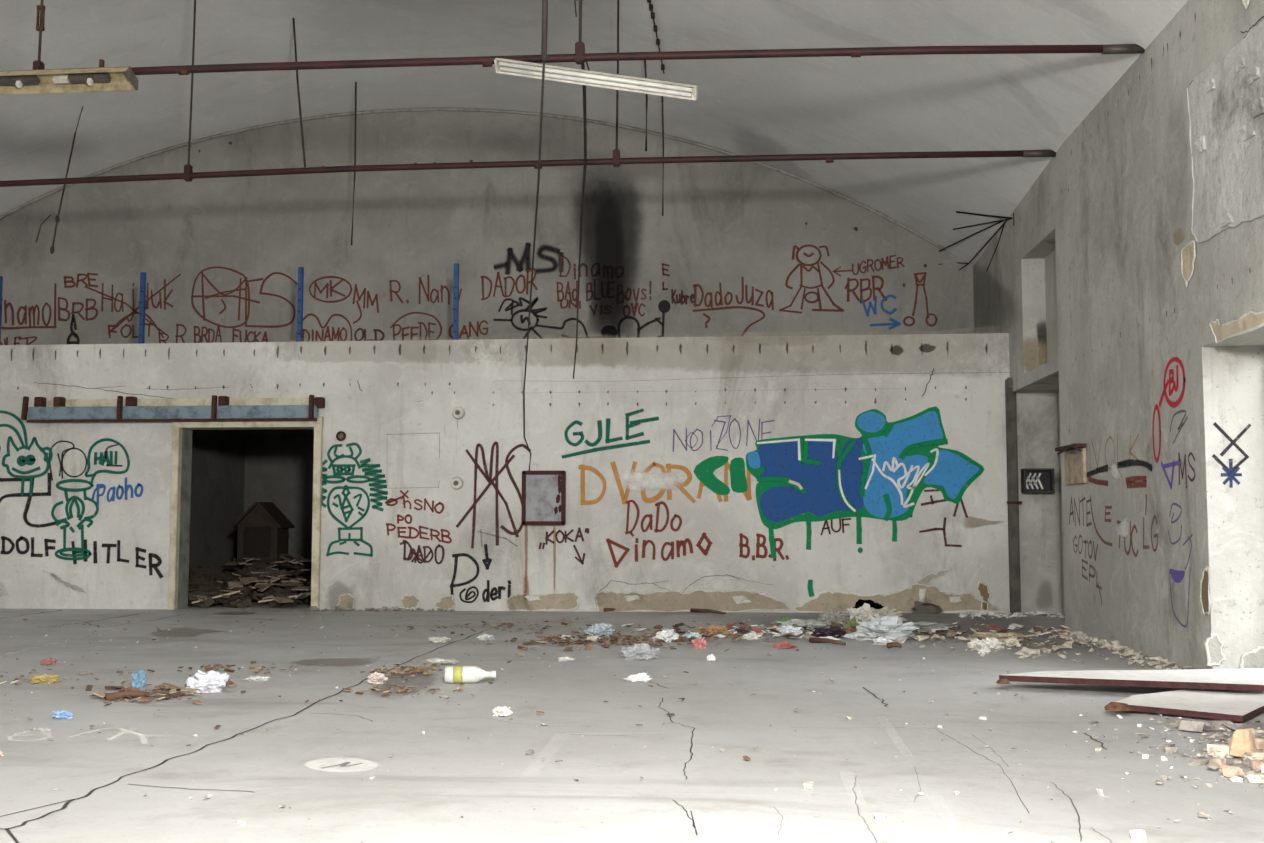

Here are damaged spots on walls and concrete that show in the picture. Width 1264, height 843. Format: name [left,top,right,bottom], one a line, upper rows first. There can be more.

peeling [1181,19,1264,287]
spalling [1209,311,1264,344]
spalling [505,568,1008,613]
crack [0,625,502,843]